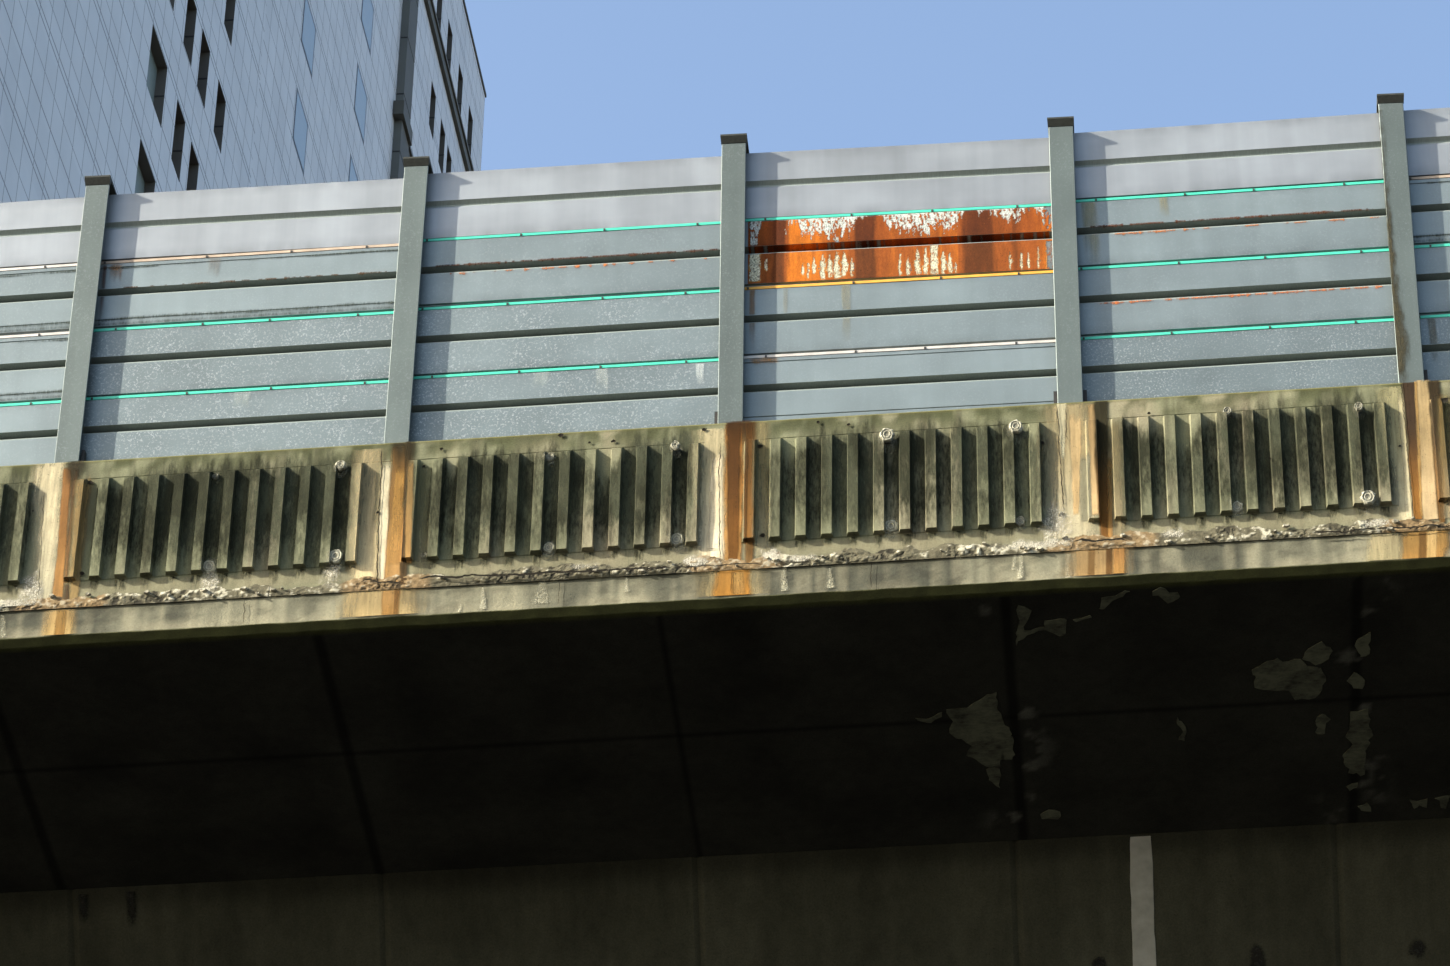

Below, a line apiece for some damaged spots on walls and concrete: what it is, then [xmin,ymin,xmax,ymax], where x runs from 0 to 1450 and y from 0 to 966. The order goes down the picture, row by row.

rust [748,206,1053,307]
leakage [0,476,42,607]
rust [37,461,91,636]
leakage [91,455,356,589]
rust [344,441,427,617]
leakage [426,432,717,568]
rust [700,420,768,596]
leakage [761,421,1072,591]
rust [1052,401,1125,576]
leakage [1120,392,1396,527]
rust [1367,380,1450,561]